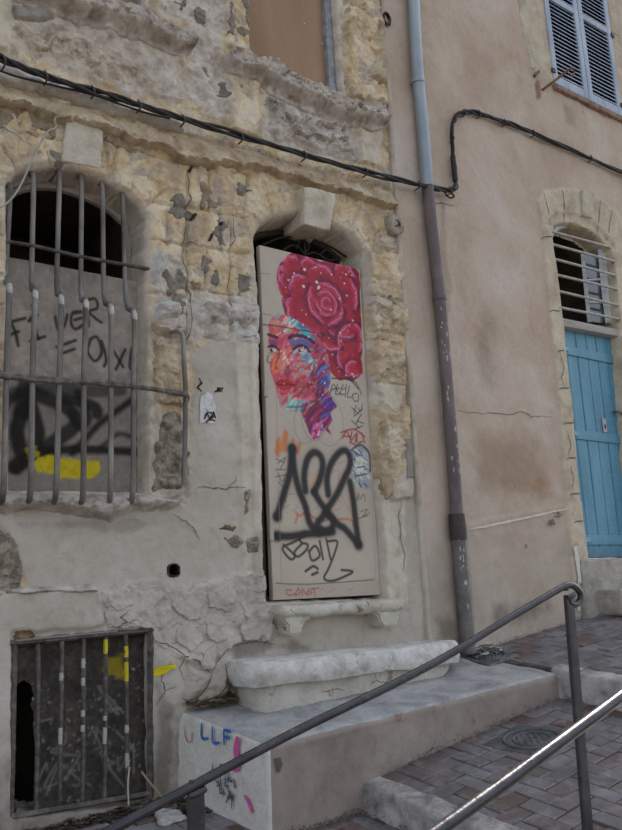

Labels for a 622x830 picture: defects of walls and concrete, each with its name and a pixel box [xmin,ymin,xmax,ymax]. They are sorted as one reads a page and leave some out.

spalling [151,338,190,492]
crack [459,410,545,418]
crack [564,422,579,495]
spalling [0,530,23,593]
spalling [219,525,260,553]
crack [154,639,276,705]